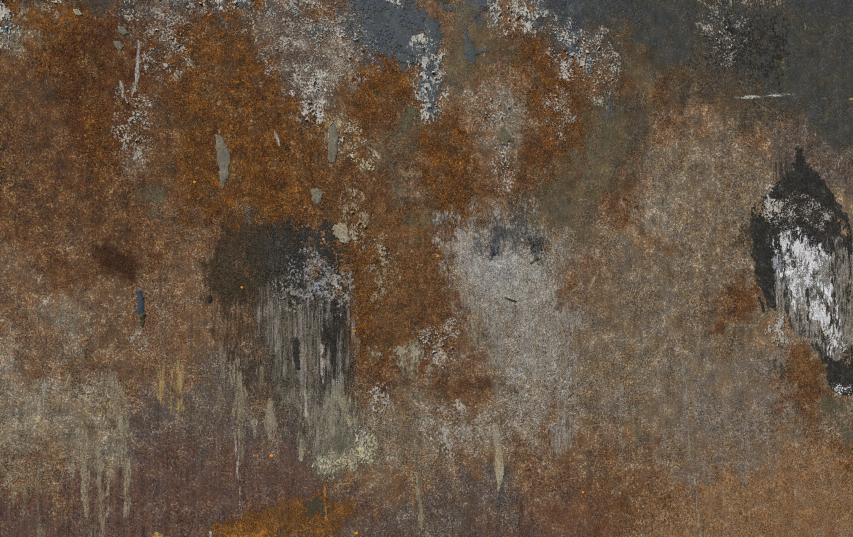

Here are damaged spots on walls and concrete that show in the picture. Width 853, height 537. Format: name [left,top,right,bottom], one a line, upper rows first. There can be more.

peeling [0,0,26,50]
peeling [215,134,230,188]
rust [0,0,479,360]
peeling [111,0,449,173]
peeling [272,248,334,312]
peeling [310,188,322,205]
peeling [332,181,402,308]
rust [512,31,603,190]
damp [775,224,853,361]
damp [229,274,374,463]
rust [577,406,853,537]